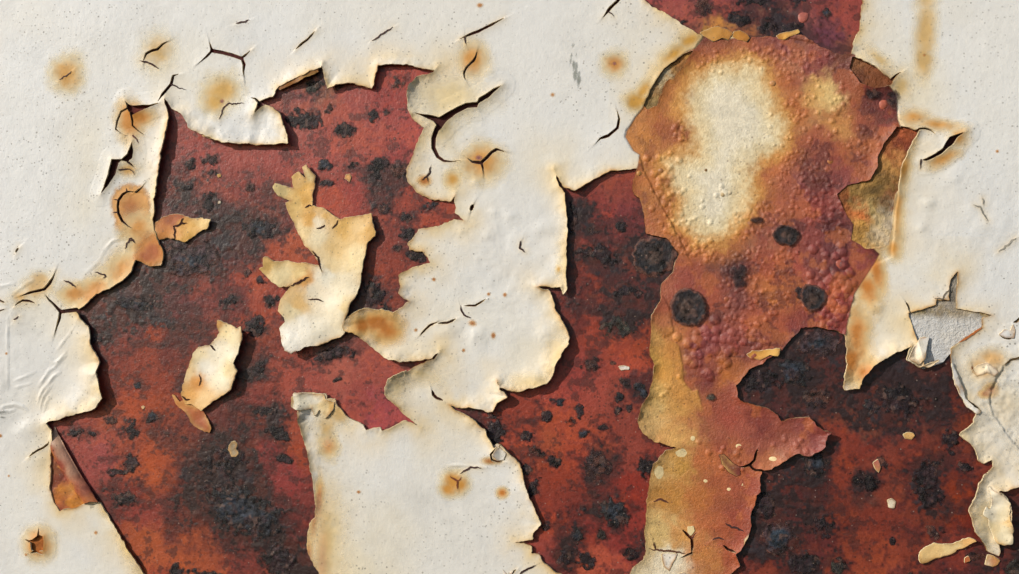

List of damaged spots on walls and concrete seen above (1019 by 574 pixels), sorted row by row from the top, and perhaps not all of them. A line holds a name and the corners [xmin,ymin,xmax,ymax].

crack [103,42,186,248]
crack [419,20,504,180]
peeling [646,0,893,88]
crack [920,128,962,168]
crack [0,275,82,330]
corrosion [14,164,163,308]
peeling [47,64,462,574]
corrosion [518,342,564,389]
peeling [452,169,679,574]
corrosion [625,30,968,574]
peeling [732,273,1019,574]
corrosion [307,479,331,574]